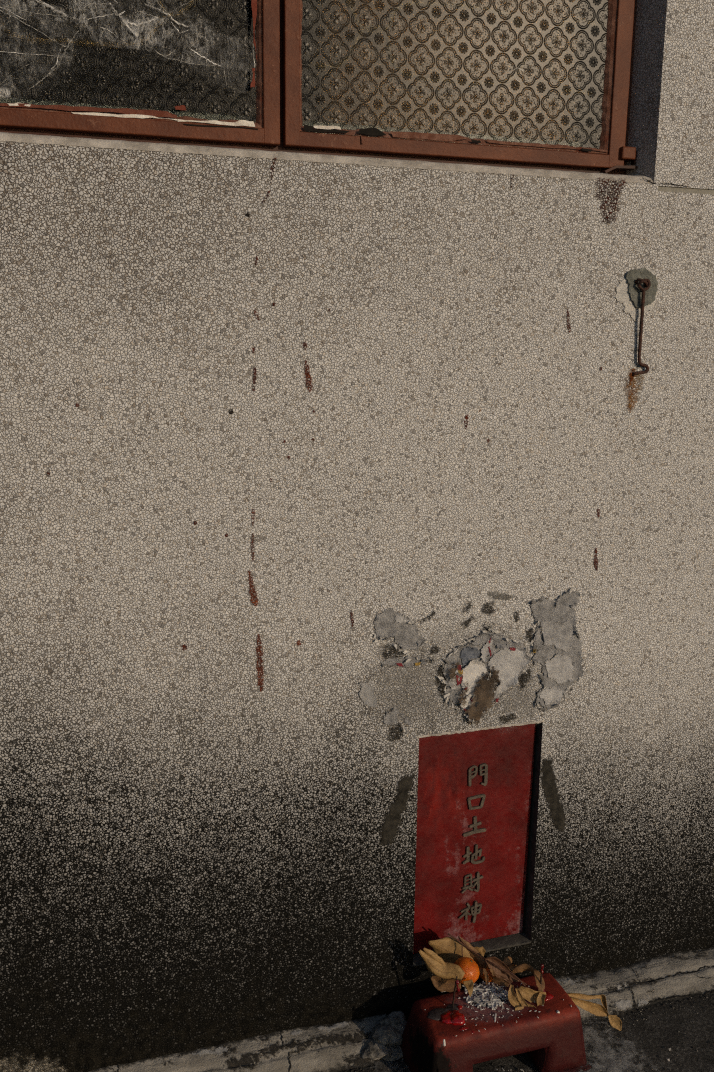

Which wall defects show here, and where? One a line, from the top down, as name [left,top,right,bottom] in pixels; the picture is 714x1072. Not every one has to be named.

corrosion [303,341,313,392]
corrosion [626,368,644,411]
corrosion [248,509,258,606]
corrosion [256,634,264,692]
peeling [374,588,584,726]
crack [612,951,714,1007]